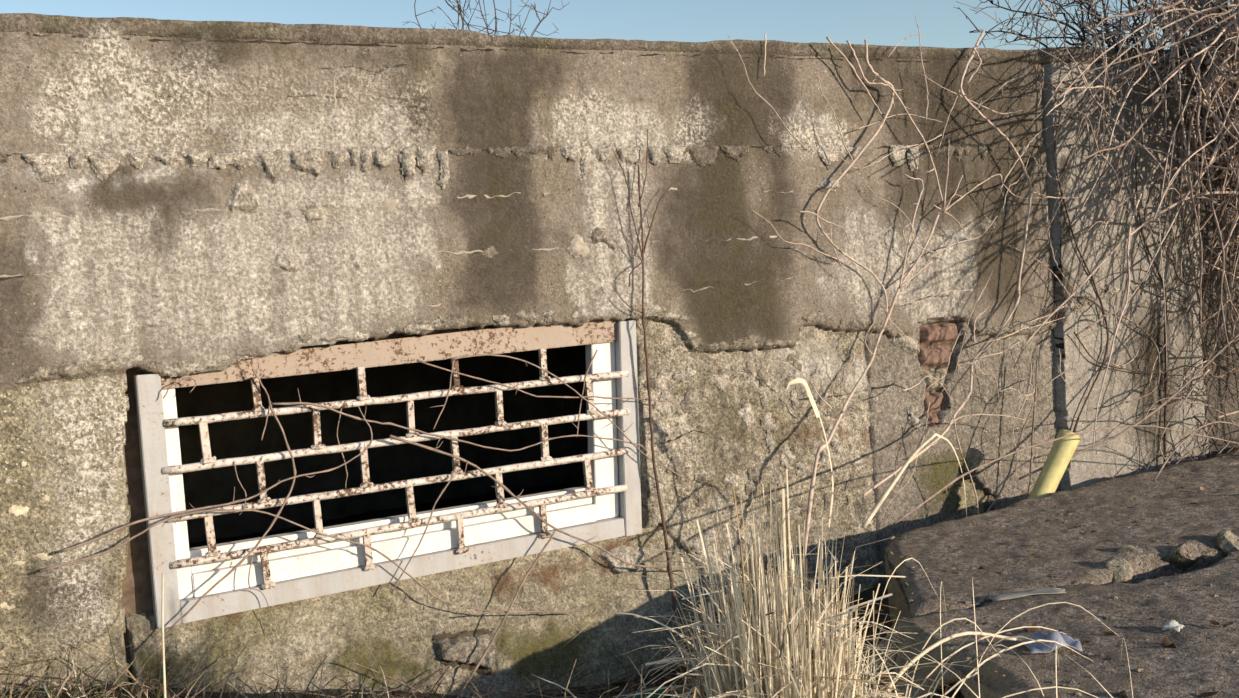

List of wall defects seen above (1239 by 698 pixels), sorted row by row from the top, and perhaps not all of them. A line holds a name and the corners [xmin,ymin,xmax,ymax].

spalling [22,144,774,214]
water stain [553,46,868,390]
spalling [112,347,264,377]
water stain [27,25,556,635]
spalling [281,331,369,353]
spalling [386,315,475,335]
spalling [492,272,1194,637]